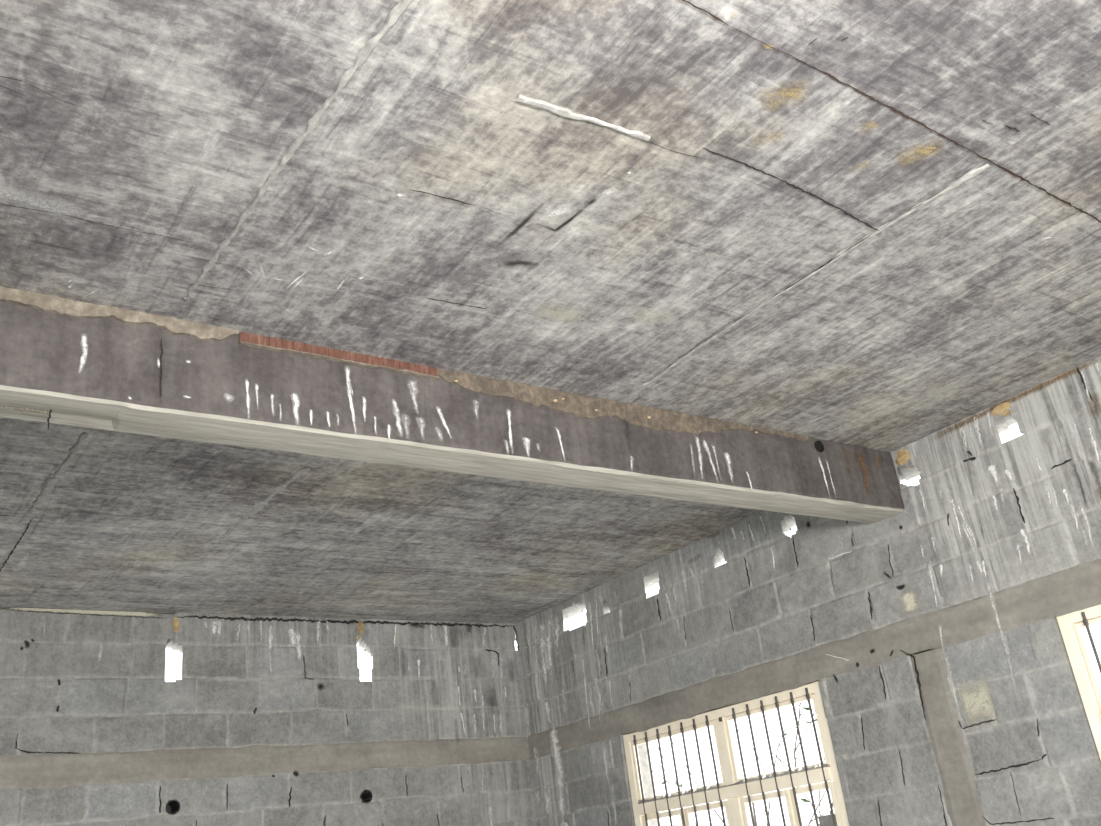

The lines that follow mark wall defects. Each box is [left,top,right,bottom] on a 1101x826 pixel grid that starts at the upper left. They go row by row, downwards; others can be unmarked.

crack [648,0,1101,380]
crack [0,203,187,242]
corrosion [239,332,439,380]
damp [293,394,312,424]
damp [346,369,401,438]
spalling [437,368,810,442]
crack [1077,367,1094,403]
damp [697,438,732,476]